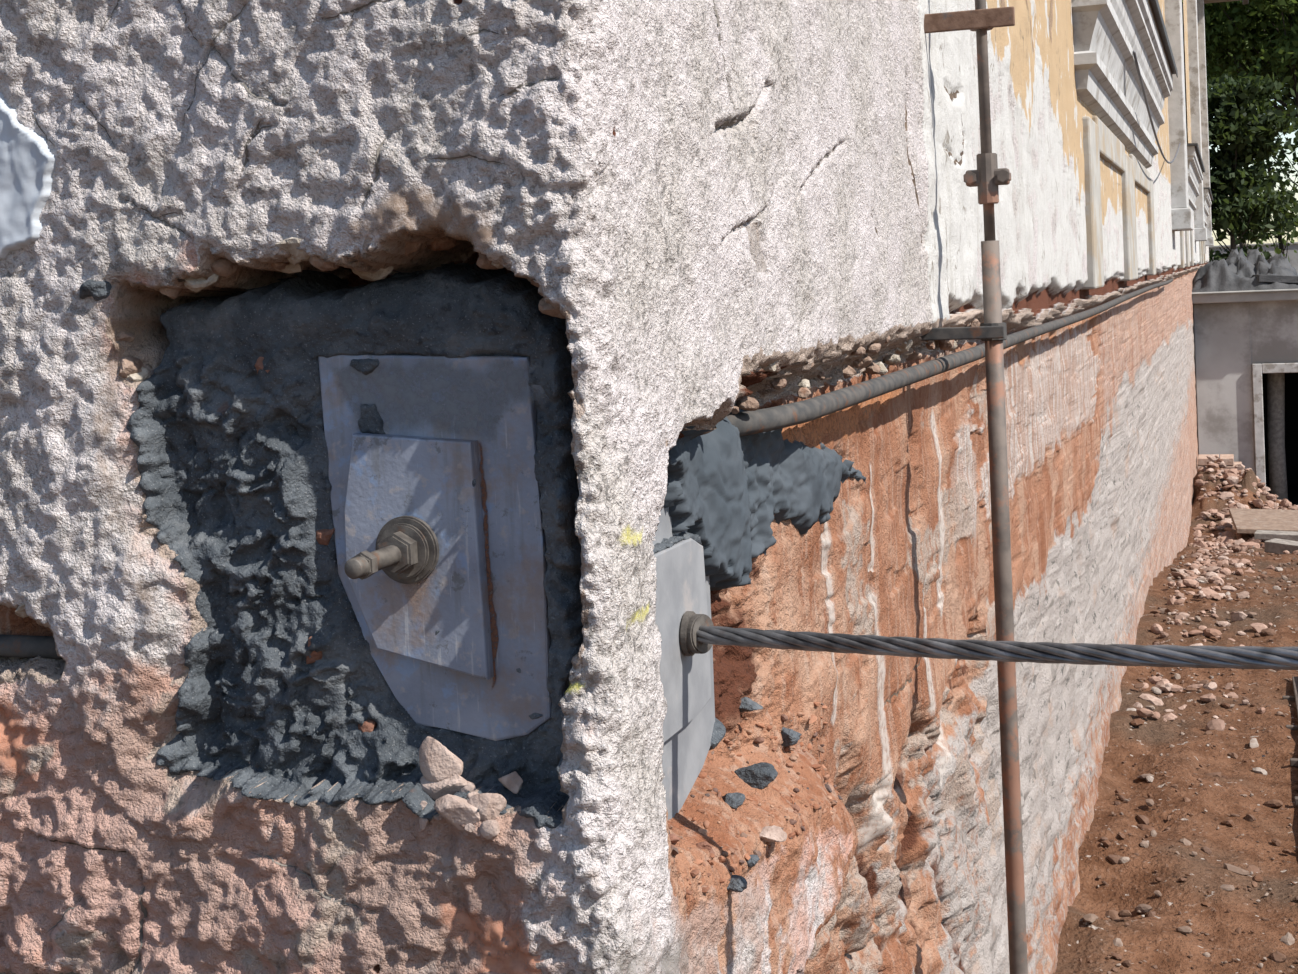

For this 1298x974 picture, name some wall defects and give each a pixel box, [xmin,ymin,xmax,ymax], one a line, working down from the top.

crack [178,0,277,172]
crack [326,0,388,35]
crack [713,0,760,232]
crack [905,105,919,206]
peeling [986,0,1088,225]
spalling [665,308,991,549]
damp [821,522,835,633]
damp [860,655,893,850]
spalling [796,659,994,974]
damp [924,657,935,711]
damp [922,414,944,638]
peeling [1002,281,1145,511]